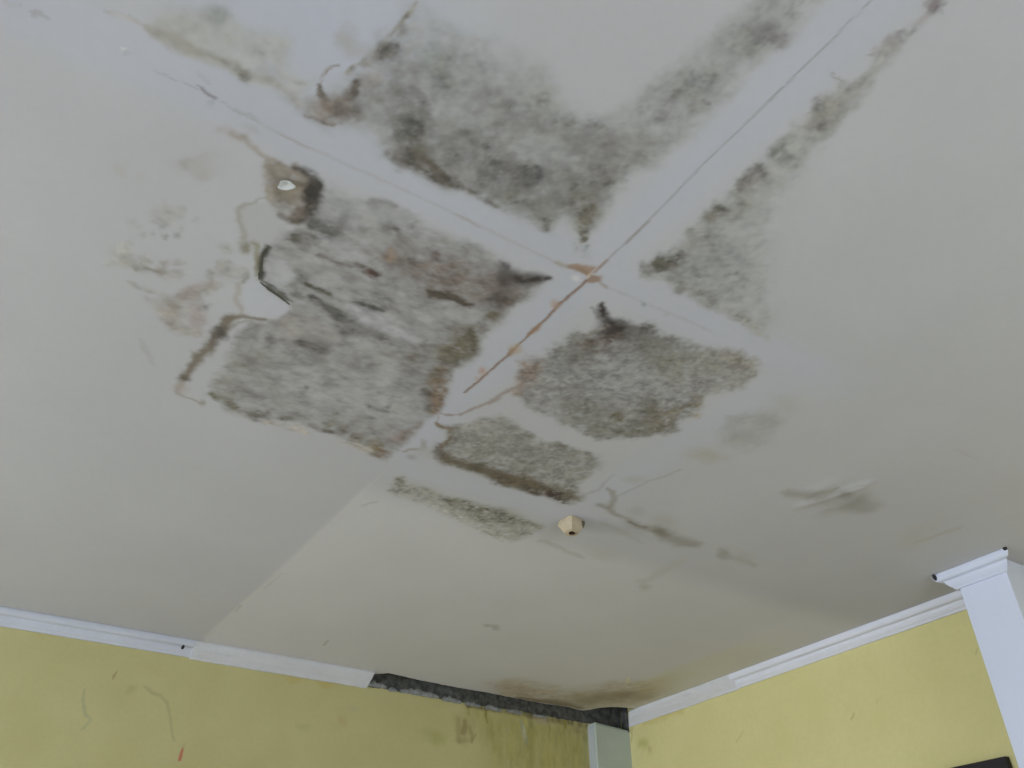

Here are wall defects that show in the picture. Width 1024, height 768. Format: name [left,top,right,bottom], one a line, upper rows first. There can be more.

damp [98,0,952,508]
crack [595,0,873,274]
damp [359,473,629,565]
spalling [367,673,629,731]